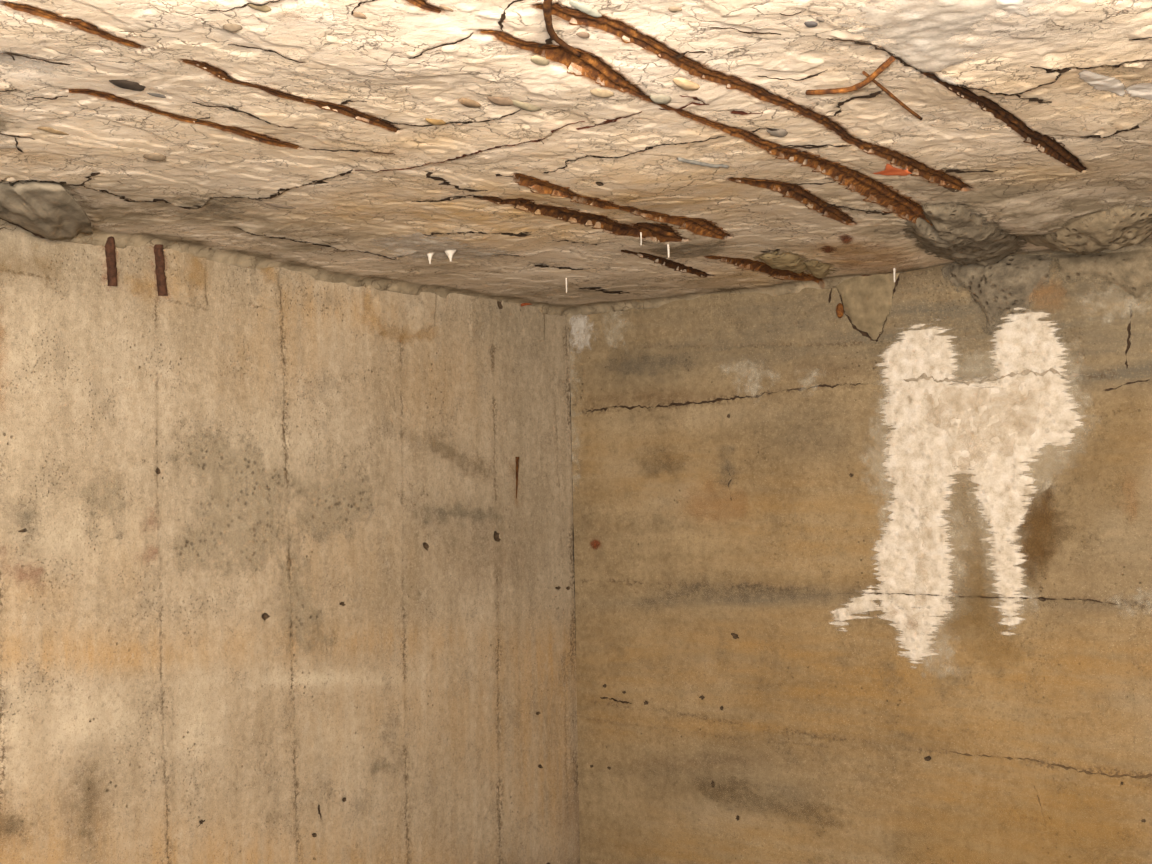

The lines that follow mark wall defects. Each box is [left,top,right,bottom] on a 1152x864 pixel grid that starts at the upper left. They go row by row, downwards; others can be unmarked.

spalling [1,2,142,48]
spalling [26,89,301,149]
spalling [182,60,406,132]
crack [0,95,763,209]
crack [409,32,473,59]
spalling [481,0,970,226]
crack [821,90,883,119]
crack [827,37,1152,103]
spalling [923,72,1087,172]
spalling [425,161,822,283]
crack [234,227,629,294]
damp [830,308,1089,668]